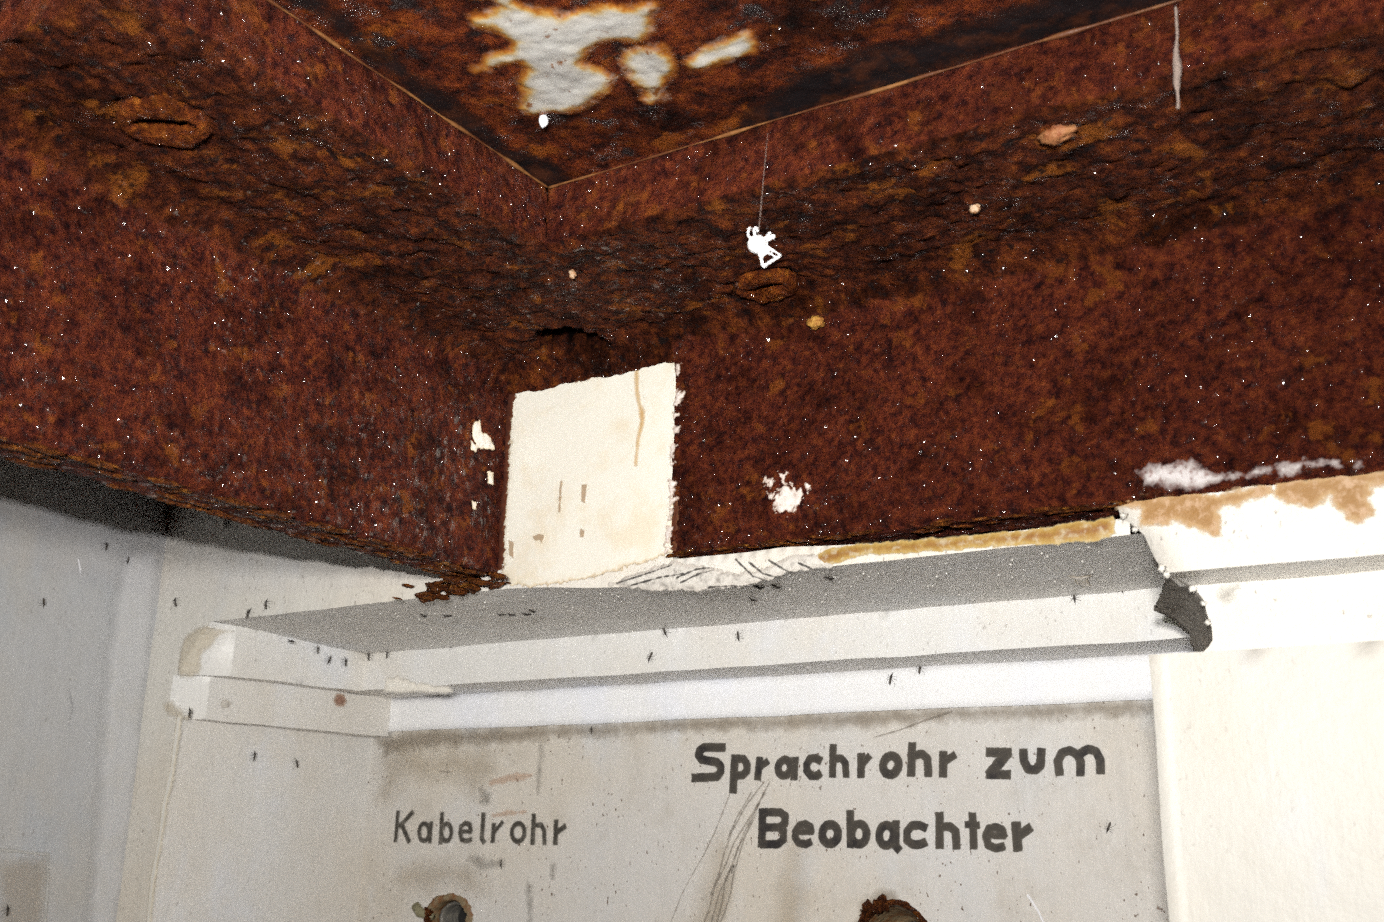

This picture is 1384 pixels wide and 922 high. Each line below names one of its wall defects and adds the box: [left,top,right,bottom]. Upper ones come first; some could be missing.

peeling [466,0,760,116]
rust [1037,124,1078,146]
rust [635,371,644,464]
rust [392,394,517,603]
rust [670,499,679,551]
peeling [502,362,1213,652]
leakage [1140,459,1338,489]
rust [1122,471,1384,537]